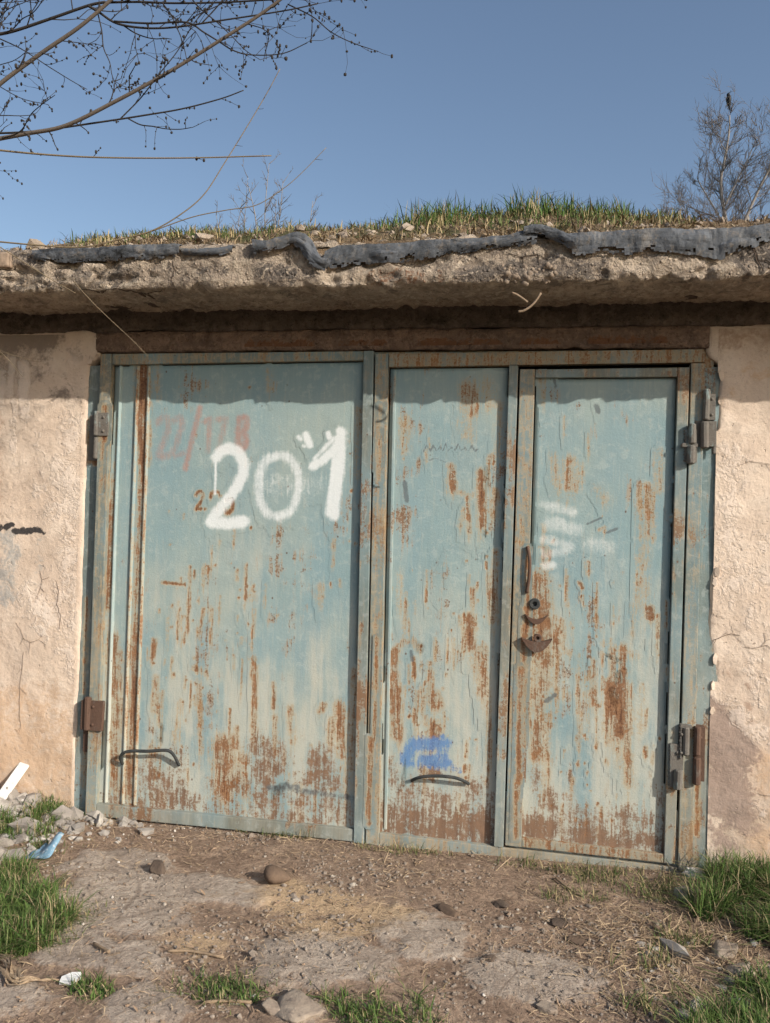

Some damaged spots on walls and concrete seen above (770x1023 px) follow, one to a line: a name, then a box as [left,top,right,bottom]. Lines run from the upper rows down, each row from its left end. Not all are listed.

rust [79,363,678,870]
rust [693,724,709,839]
leakage [707,681,770,867]